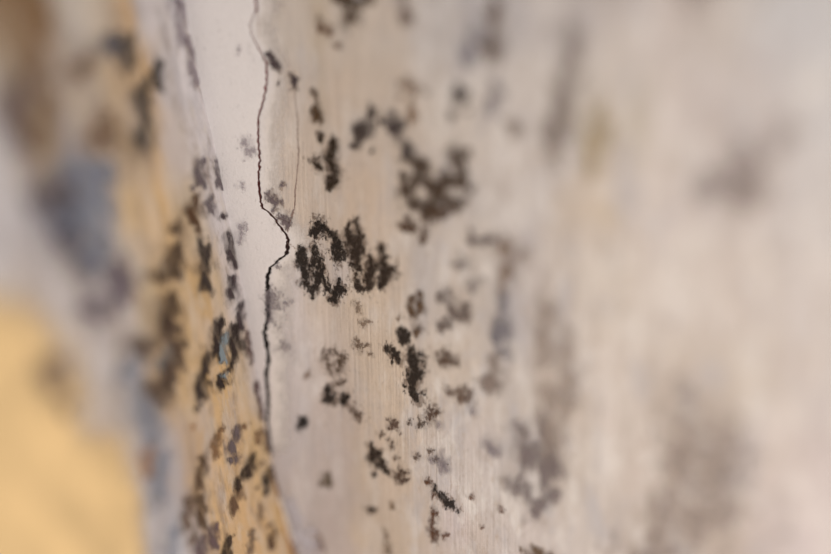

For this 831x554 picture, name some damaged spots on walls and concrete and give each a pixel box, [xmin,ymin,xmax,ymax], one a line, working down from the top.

leakage [120,158,225,512]
leakage [169,381,276,554]
leakage [193,223,254,411]
leakage [264,191,293,230]
crack [249,0,313,554]
leakage [265,49,299,90]
leakage [308,89,349,193]
leakage [316,336,373,424]
leakage [295,214,402,306]
leakage [349,79,473,247]
leakage [364,282,478,486]
leakage [424,477,459,543]